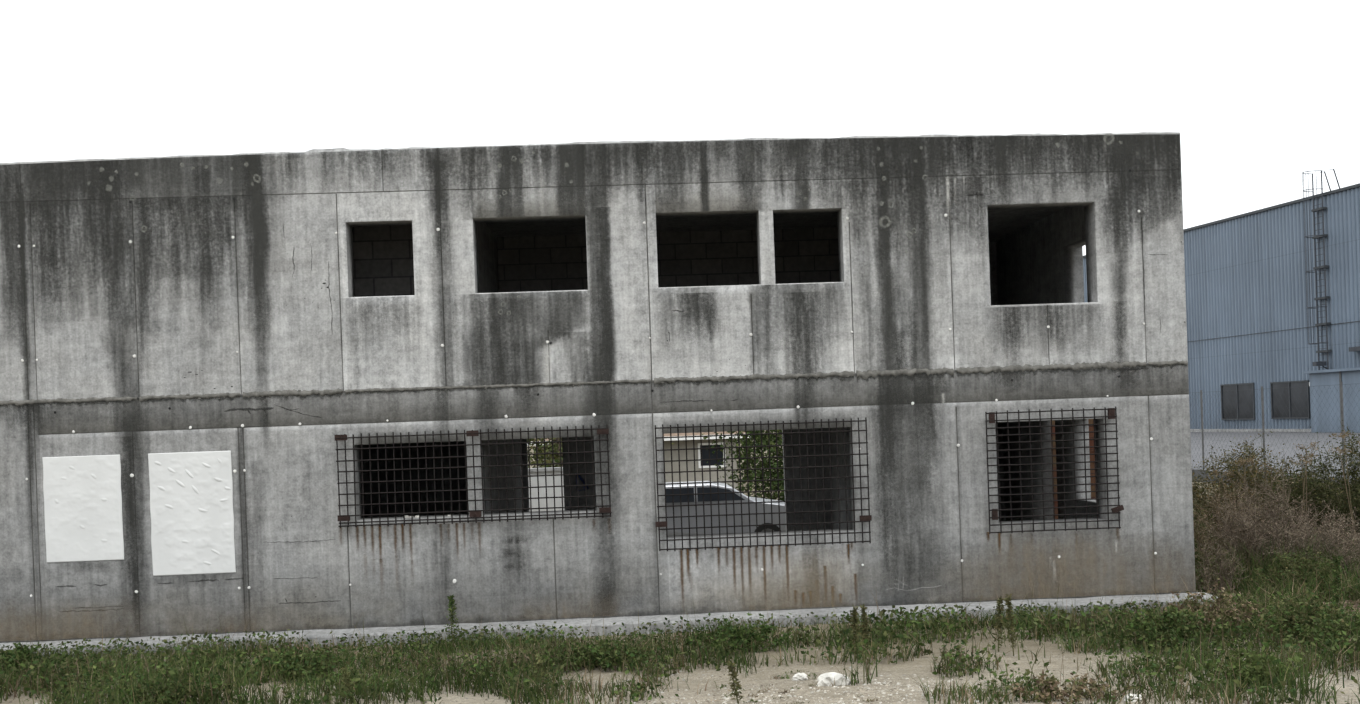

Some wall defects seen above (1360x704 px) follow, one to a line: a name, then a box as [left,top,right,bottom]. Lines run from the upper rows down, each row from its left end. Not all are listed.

leakage [0,153,297,608]
leakage [422,134,1179,583]
corrosion [340,524,412,555]
corrosion [680,549,698,592]
corrosion [717,545,856,604]